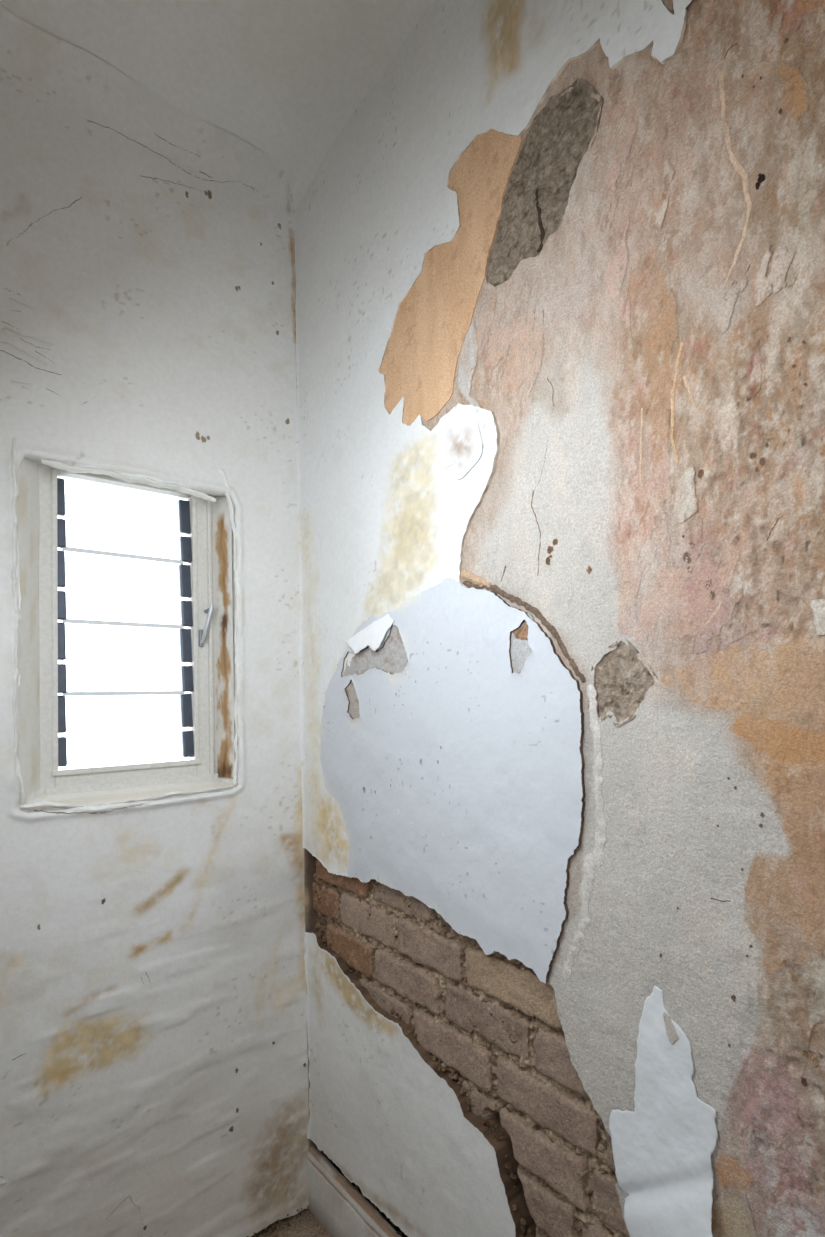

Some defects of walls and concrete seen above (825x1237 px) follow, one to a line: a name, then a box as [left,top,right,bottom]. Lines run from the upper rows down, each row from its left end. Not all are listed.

crack [88,120,260,201]
rust [213,507,235,778]
peeling [312,0,825,1237]
leakage [107,785,247,962]
leakage [25,979,159,1103]
leakage [234,1076,436,1237]